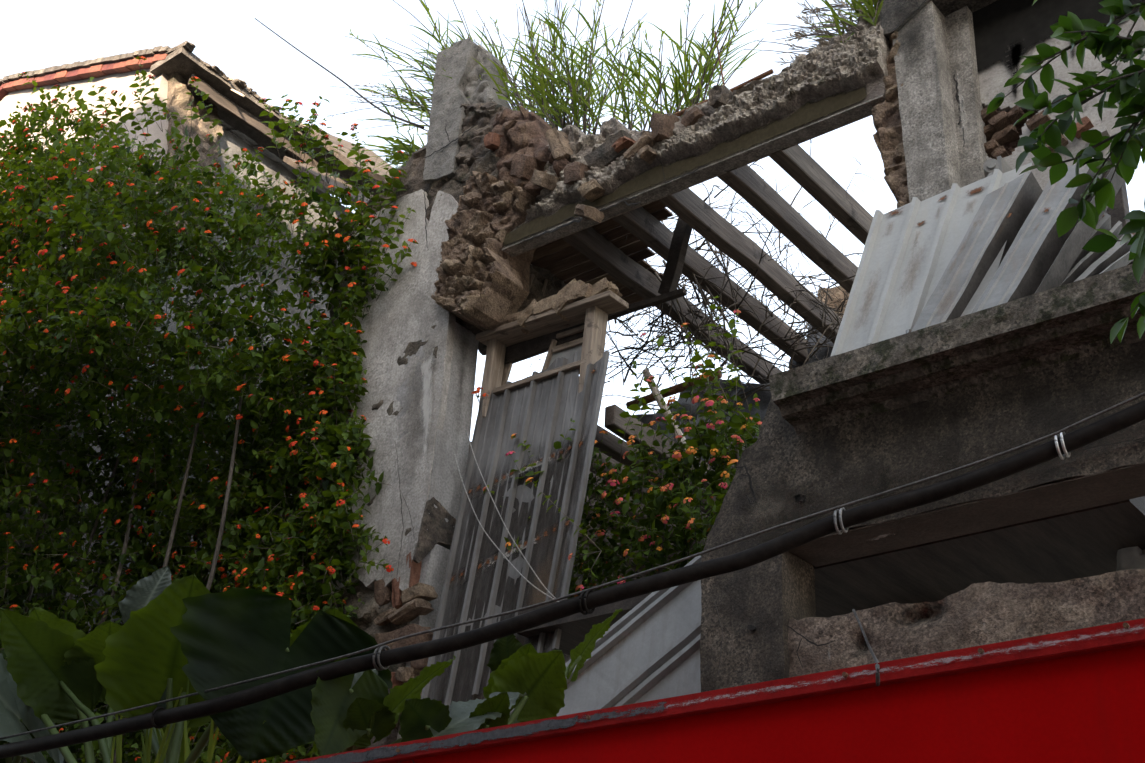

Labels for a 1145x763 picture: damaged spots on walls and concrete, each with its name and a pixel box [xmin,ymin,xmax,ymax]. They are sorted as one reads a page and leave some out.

crack [953,74,965,147]
spalling [981,105,1039,160]
flaking render [374,497,456,651]